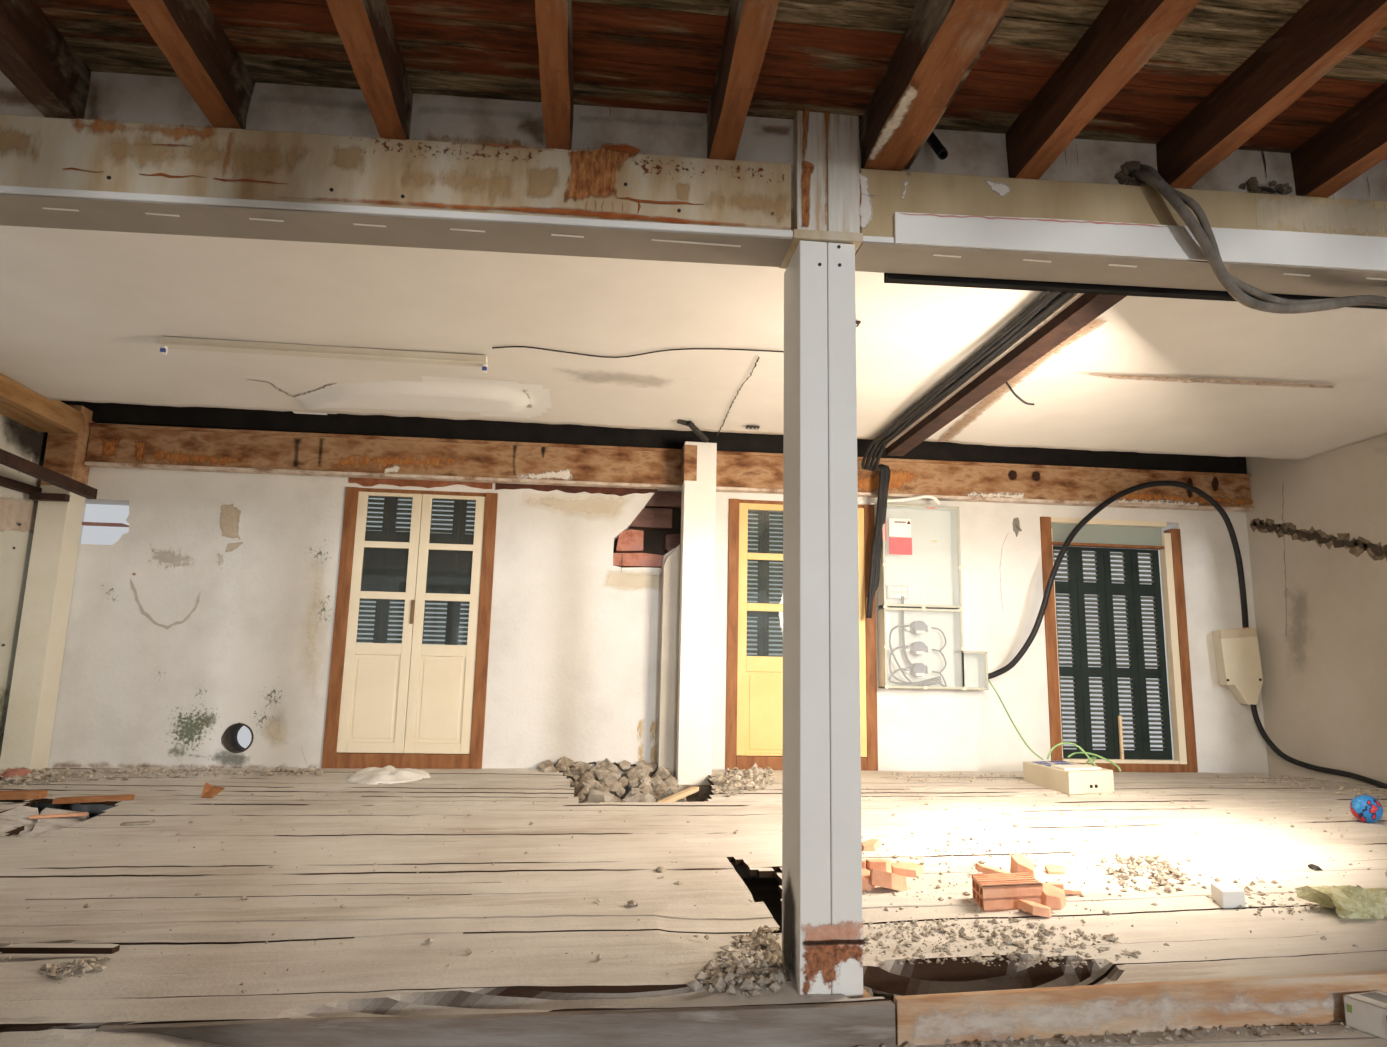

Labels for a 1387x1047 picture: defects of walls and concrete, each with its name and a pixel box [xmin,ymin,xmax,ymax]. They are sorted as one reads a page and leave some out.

rust [134,126,286,184]
rust [364,138,542,161]
rust [317,144,784,225]
rust [801,109,829,227]
peeling [0,498,37,532]
peeling [220,504,243,552]
flaking render [349,466,682,592]
damp [166,690,215,754]
rust [782,877,865,995]